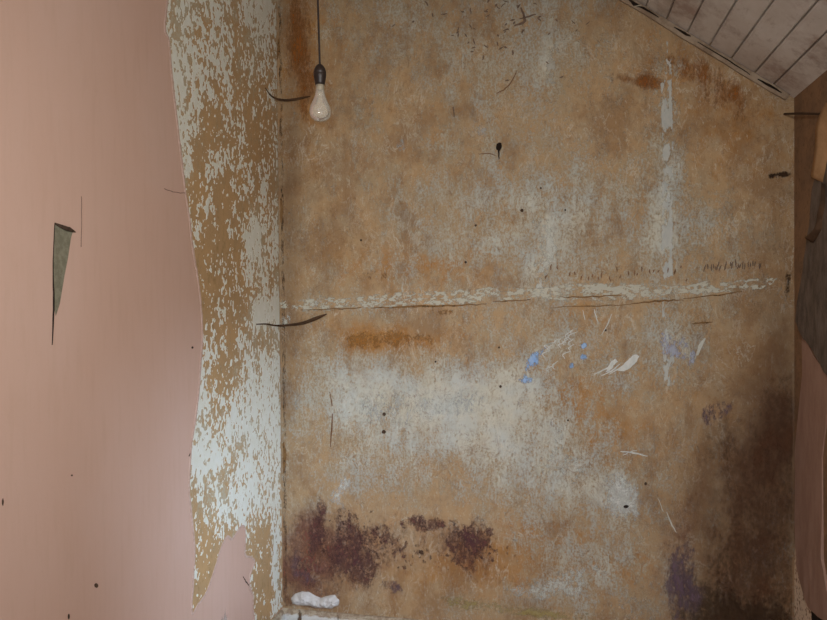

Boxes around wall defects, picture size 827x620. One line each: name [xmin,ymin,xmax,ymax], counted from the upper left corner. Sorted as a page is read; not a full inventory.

rust [625,74,661,88]
peeling [164,0,350,620]
water stain [665,497,789,620]